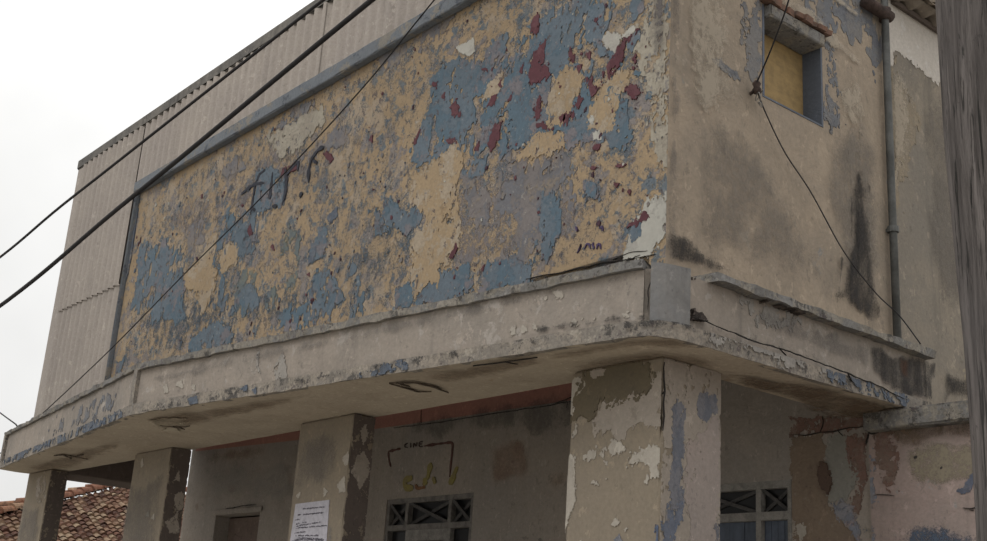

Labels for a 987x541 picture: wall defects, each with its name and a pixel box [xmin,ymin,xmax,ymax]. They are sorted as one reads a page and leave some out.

peeling [126,99,366,352]
peeling [339,0,670,309]
water stain [840,175,880,317]
peeling [802,0,940,214]
peeling [4,393,122,464]
peeling [323,414,376,541]
peeling [565,357,721,541]
water stain [872,348,935,399]
peeling [907,527,972,541]
water stain [947,374,967,396]